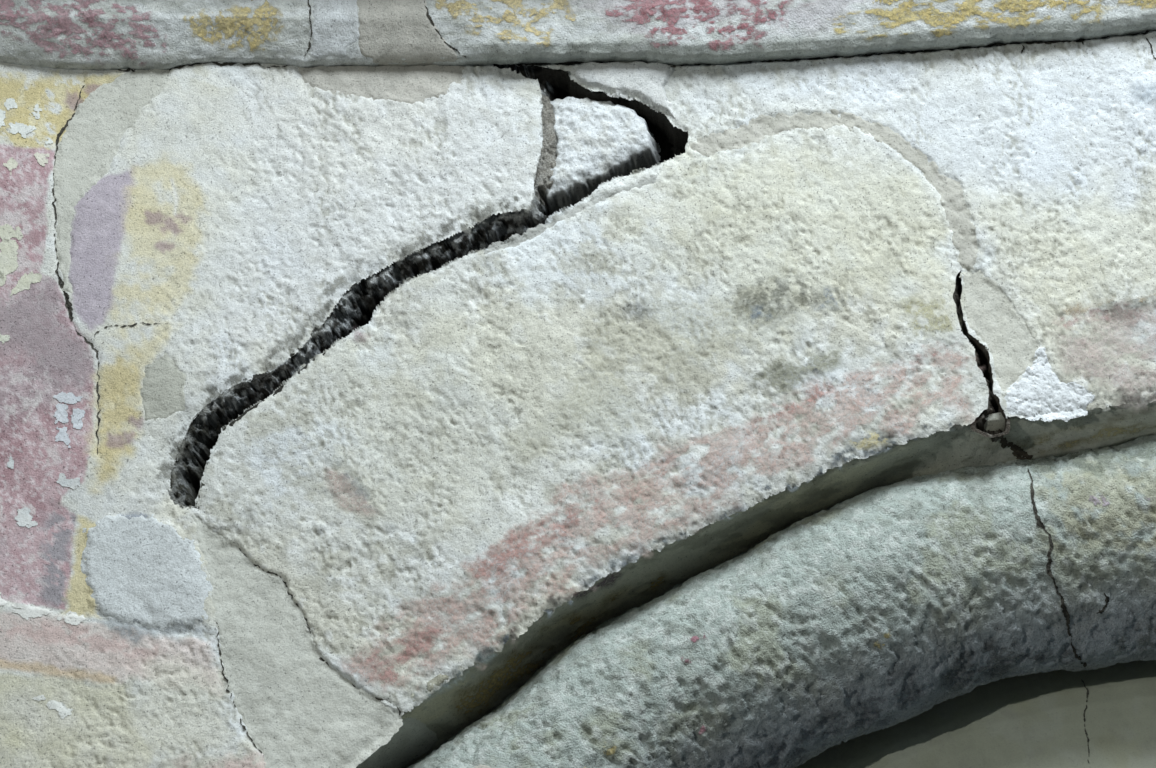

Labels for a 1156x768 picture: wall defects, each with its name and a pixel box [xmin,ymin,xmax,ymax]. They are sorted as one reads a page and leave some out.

peeling [436,0,575,47]
peeling [606,0,787,50]
crack [647,30,1156,68]
peeling [0,98,42,138]
peeling [484,61,677,254]
peeling [0,224,42,296]
crack [52,0,313,453]
crack [160,1,688,509]
peeling [53,391,85,448]
spalling [1004,347,1095,422]
crack [953,271,1109,763]
peeling [0,592,90,625]